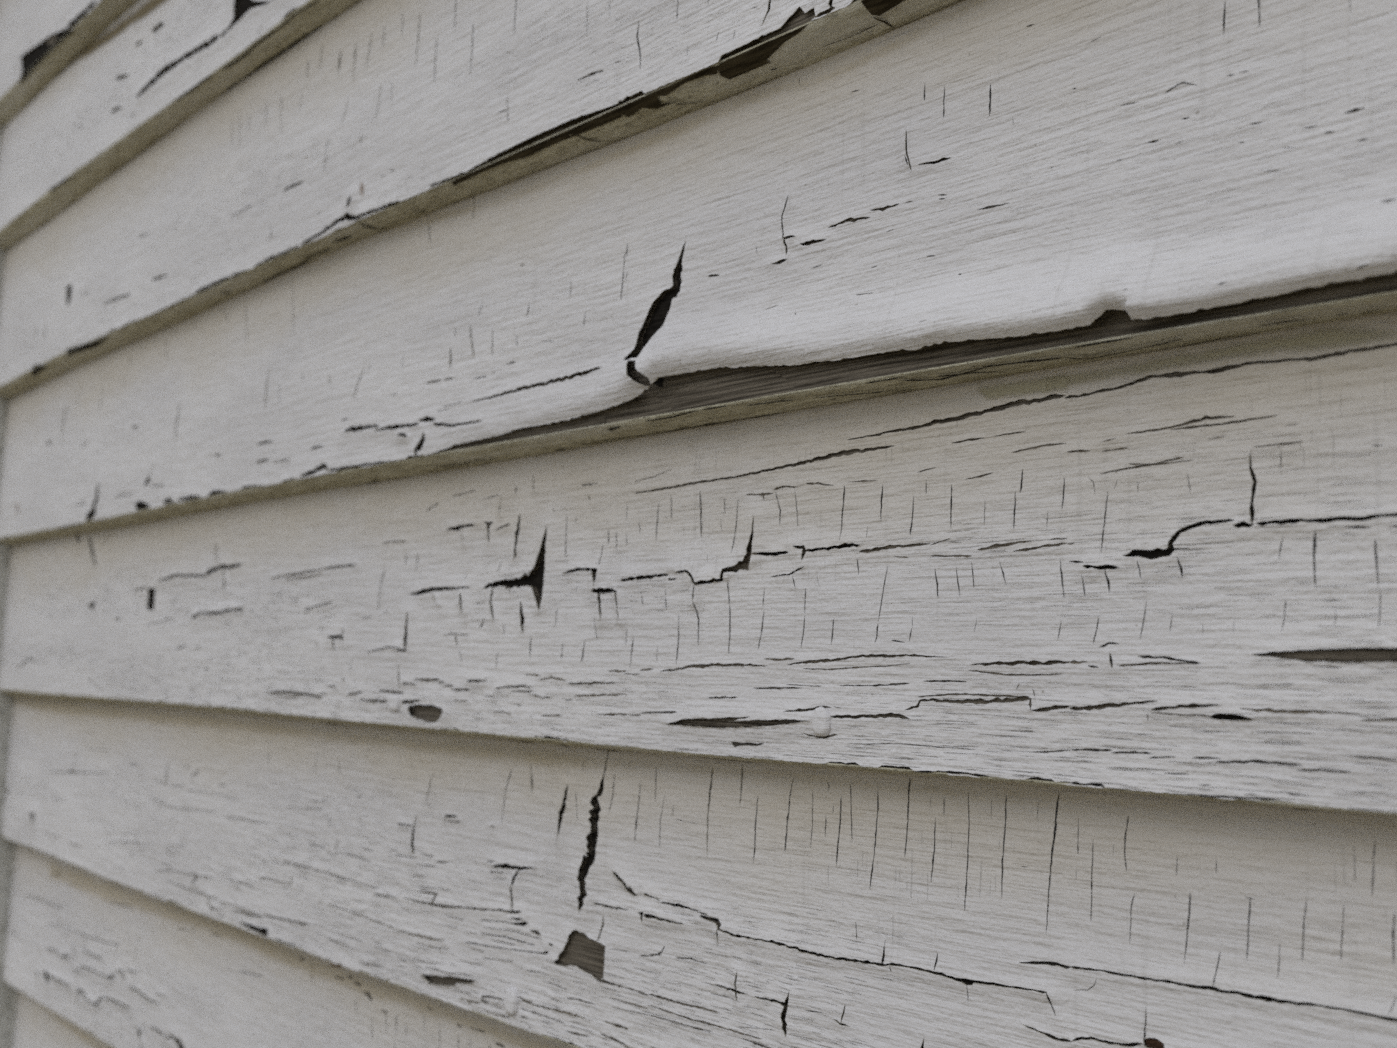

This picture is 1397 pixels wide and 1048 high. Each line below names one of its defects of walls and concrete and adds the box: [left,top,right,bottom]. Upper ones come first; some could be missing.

peeling [236,0,268,23]
peeling [20,29,74,84]
peeling [768,264,1397,391]
crack [556,264,1384,451]
crack [150,417,492,503]
peeling [439,418,582,453]
peeling [603,394,676,423]
crack [379,454,1397,668]
peeling [411,704,442,722]
crack [1211,713,1254,721]
crack [496,862,533,870]
crack [564,757,1397,1046]